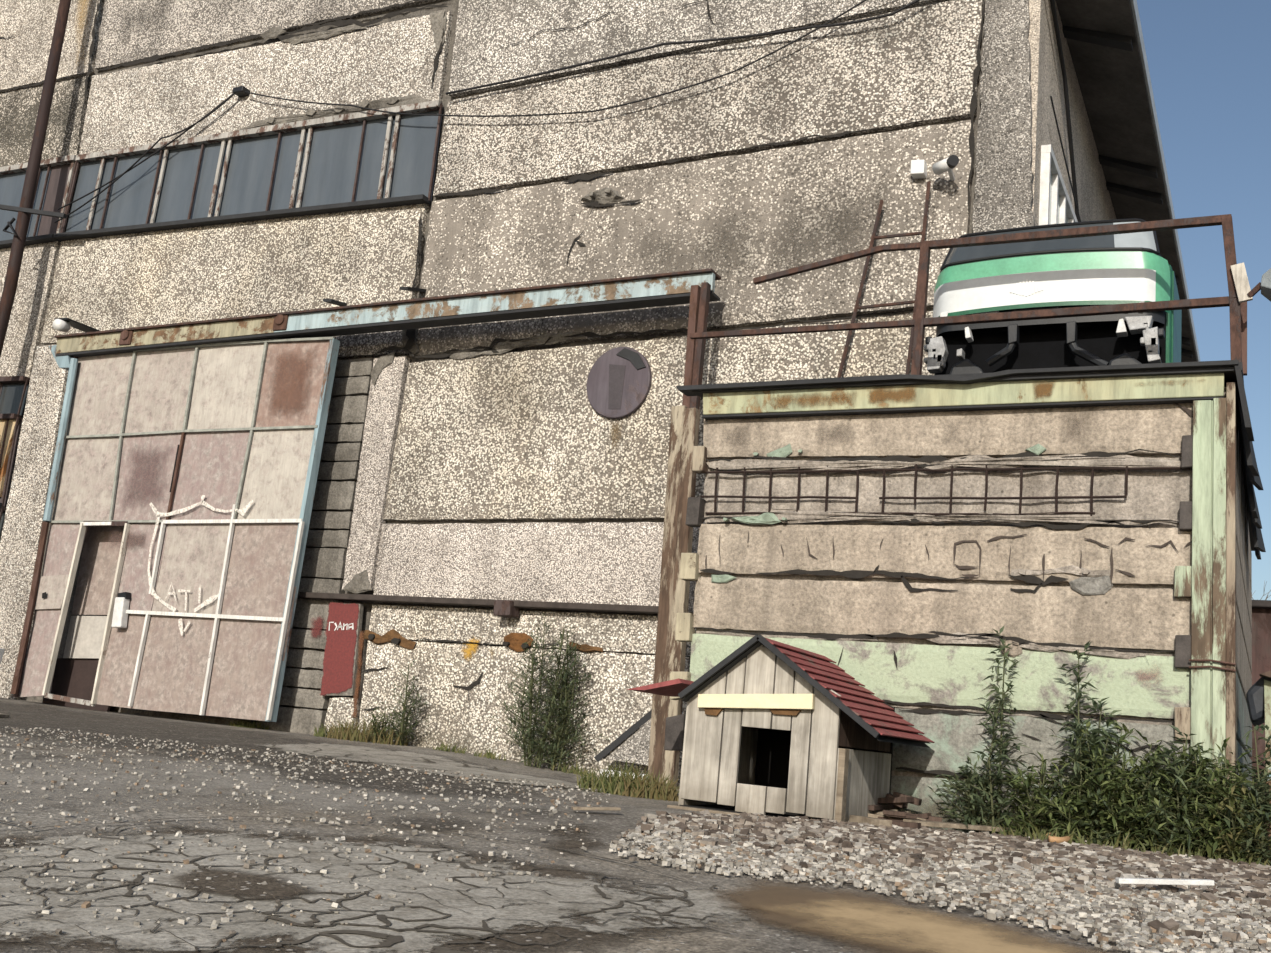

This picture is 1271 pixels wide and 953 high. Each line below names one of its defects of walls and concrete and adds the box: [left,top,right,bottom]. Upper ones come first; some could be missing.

crack [679,0,714,24]
spalling [429,9,447,52]
rust [273,357,308,410]
rust [777,395,848,406]
rust [870,387,915,403]
rust [1035,383,1053,397]
rust [502,633,533,652]